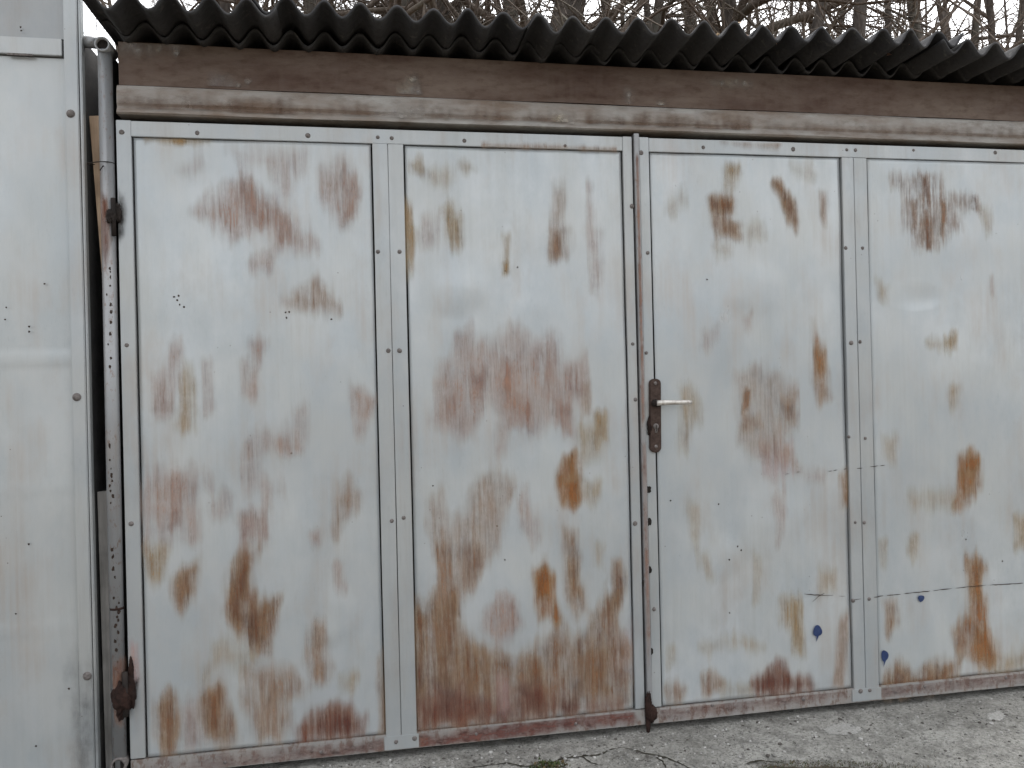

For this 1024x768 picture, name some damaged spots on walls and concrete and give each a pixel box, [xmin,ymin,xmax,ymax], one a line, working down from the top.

rust [205,182,295,244]
rust [711,197,736,235]
rust [773,181,797,226]
rust [901,178,955,248]
rust [441,338,583,427]
rust [557,414,604,510]
rust [954,451,979,508]
rust [226,520,278,652]
rust [417,483,635,747]
rust [883,557,1022,694]
rust [160,688,235,755]
rust [293,703,366,756]